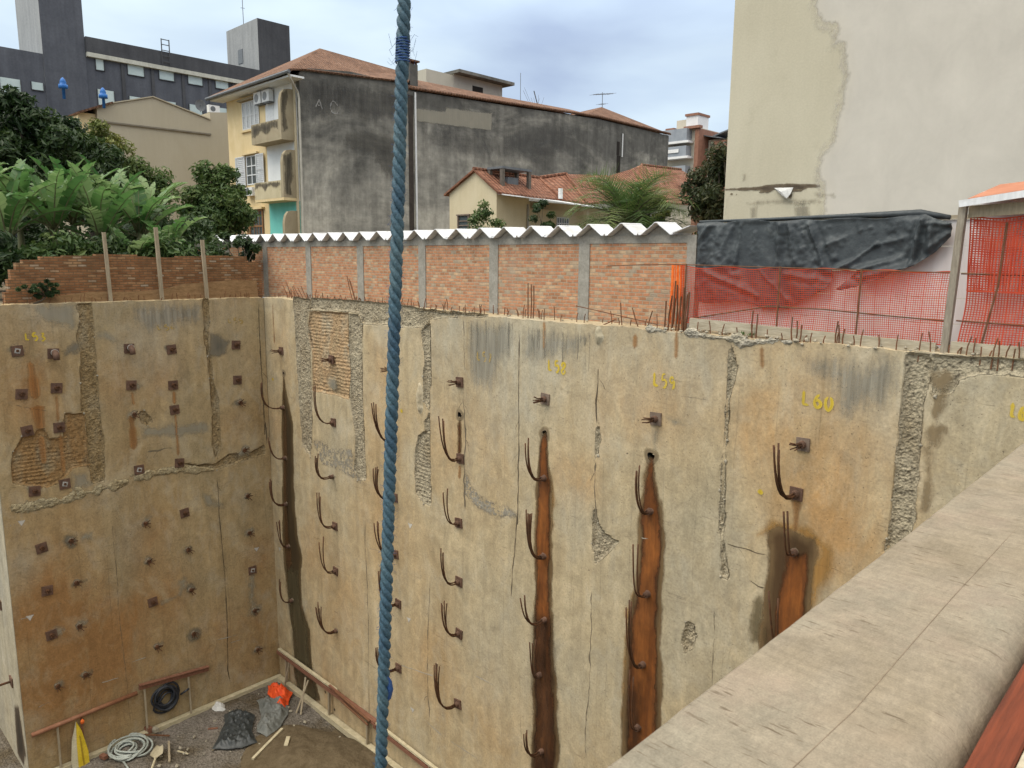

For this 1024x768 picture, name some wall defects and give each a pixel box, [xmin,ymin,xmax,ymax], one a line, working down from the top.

spalling [11,294,145,488]
spalling [161,291,265,471]
spalling [278,277,562,506]
spalling [576,281,864,579]
spalling [884,331,1024,552]
rust [531,434,560,768]
rust [621,459,666,756]
spalling [682,620,697,652]
rust [750,501,831,650]